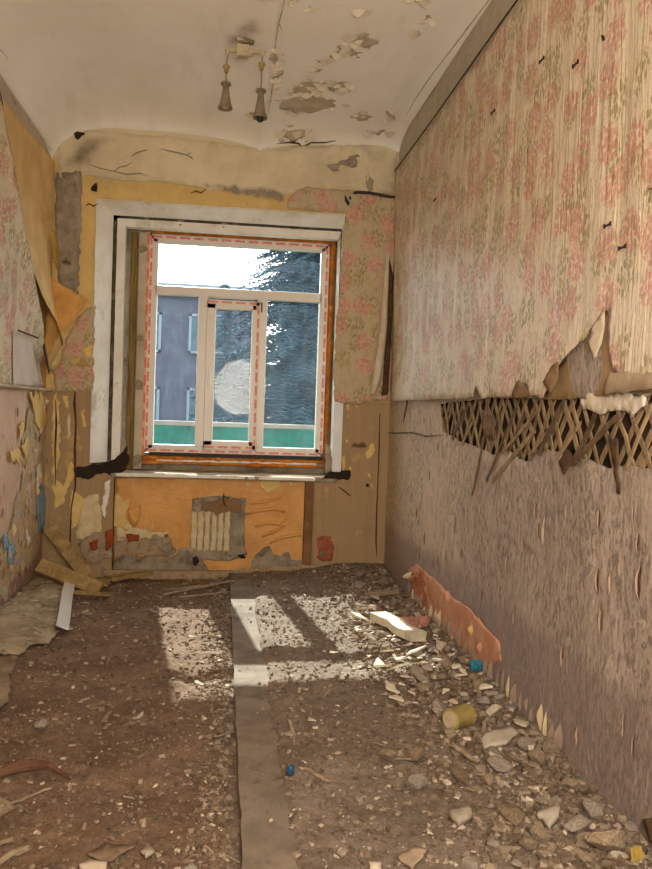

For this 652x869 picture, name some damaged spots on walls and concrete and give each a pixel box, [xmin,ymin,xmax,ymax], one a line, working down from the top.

crack [267,0,285,117]
peeling [264,32,396,143]
crack [89,148,193,176]
spalling [327,154,374,191]
peeling [2,99,97,371]
spalling [443,398,518,455]
peeling [0,390,334,601]
peeling [345,564,563,749]
peeling [643,817,652,844]